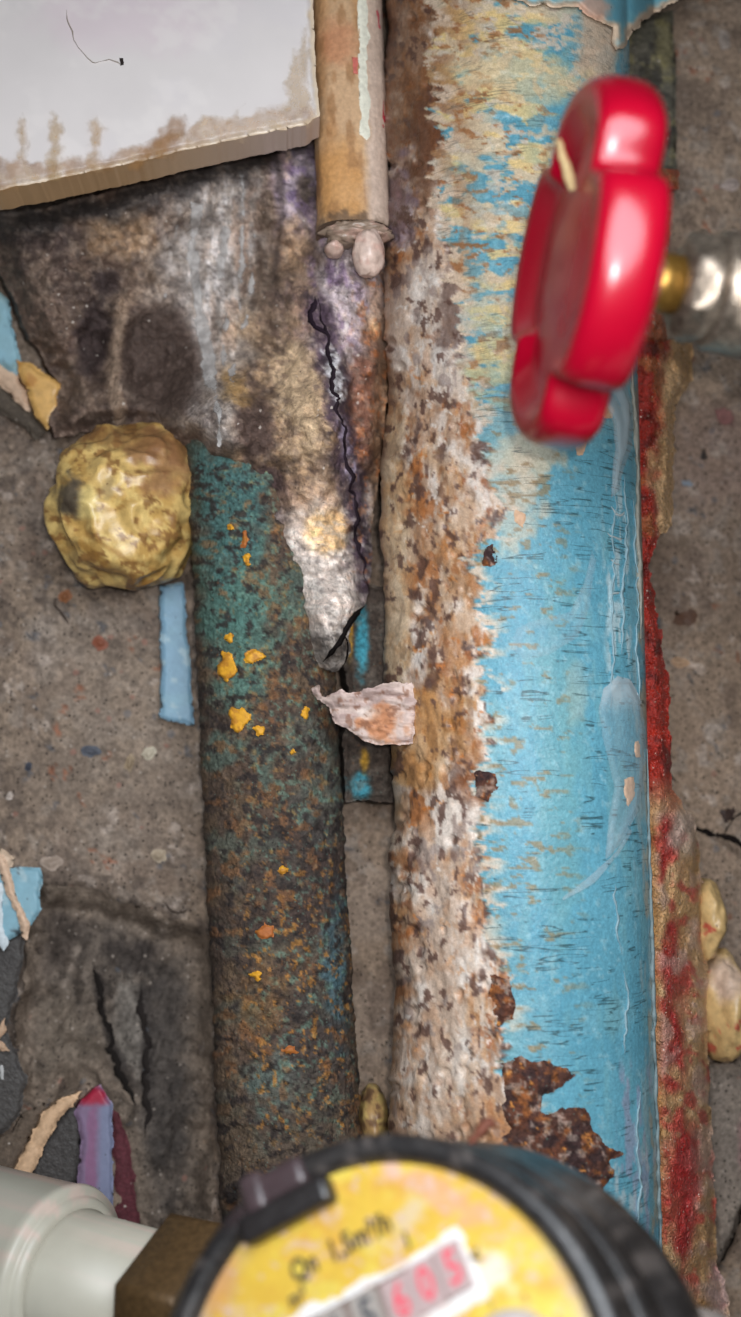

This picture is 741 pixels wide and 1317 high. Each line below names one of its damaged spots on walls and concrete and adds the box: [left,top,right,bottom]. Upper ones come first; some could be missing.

peeling [0,293,61,441]
leakage [176,176,256,447]
crack [307,296,370,663]
peeling [514,510,526,528]
peeling [630,373,643,639]
crack [696,813,741,847]
spalling [0,848,216,1229]
corrosion [467,1055,623,1188]
peeling [624,741,663,1249]
crack [717,1211,741,1267]